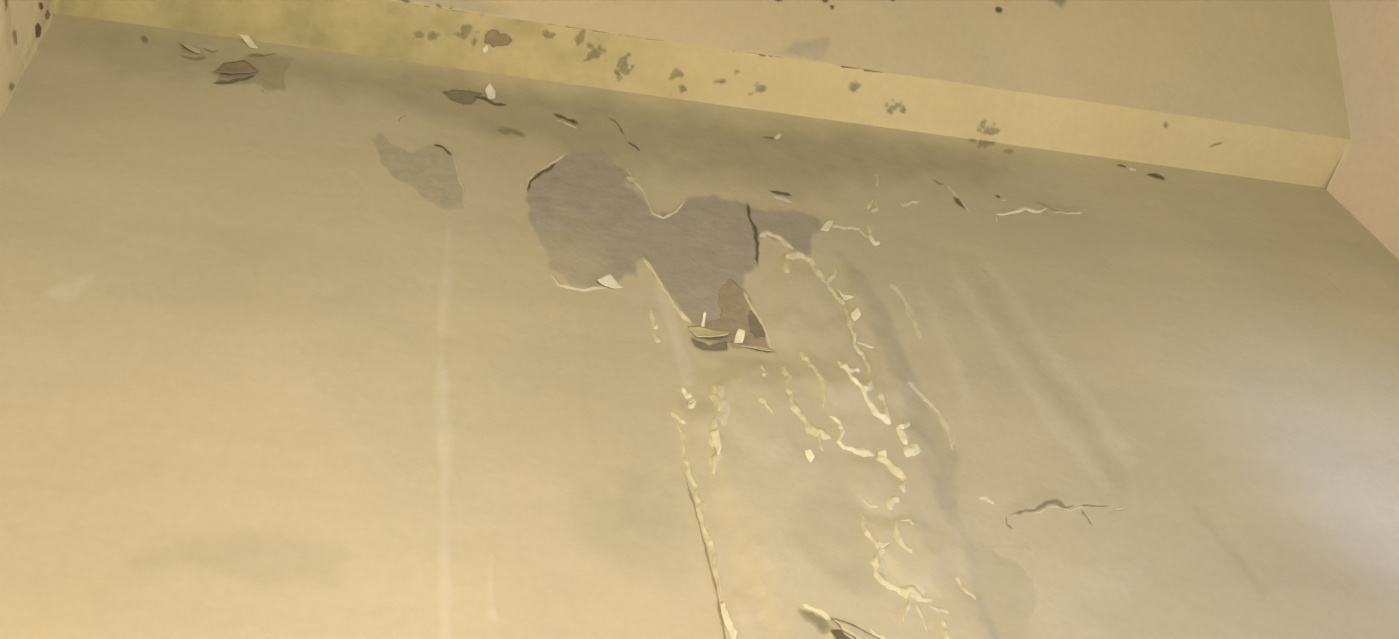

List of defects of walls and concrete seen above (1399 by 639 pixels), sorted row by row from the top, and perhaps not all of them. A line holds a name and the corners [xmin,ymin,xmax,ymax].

peeling [213,35,295,95]
peeling [368,132,467,213]
peeling [443,83,505,105]
peeling [523,148,956,639]
damp [832,248,1040,639]
damp [959,247,1144,507]
damp [774,457,893,616]